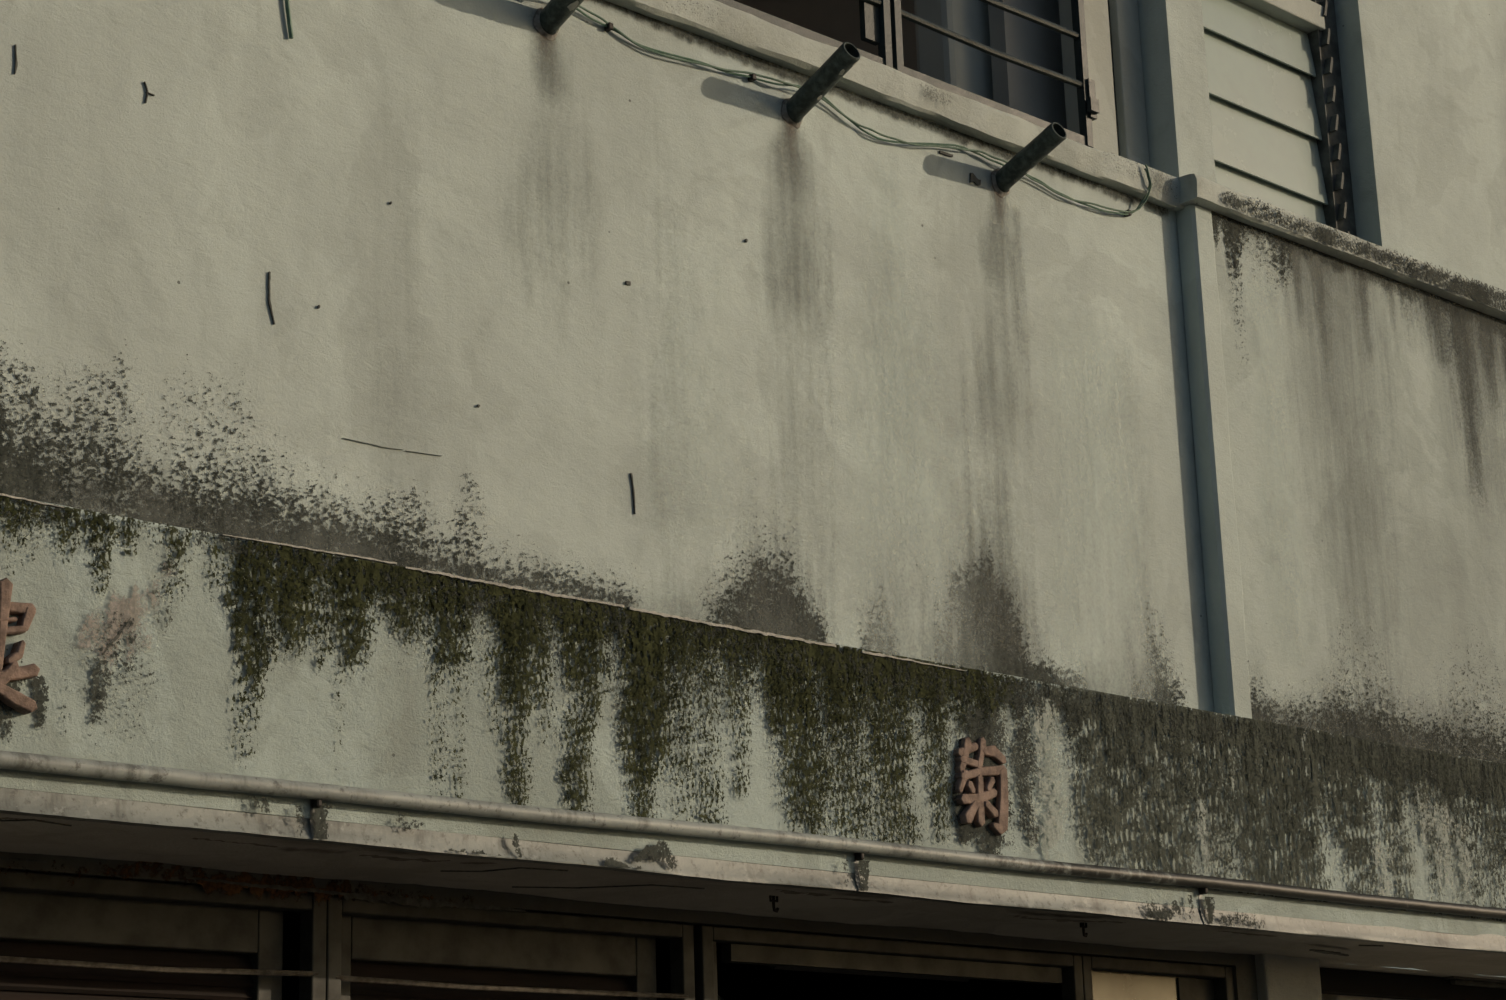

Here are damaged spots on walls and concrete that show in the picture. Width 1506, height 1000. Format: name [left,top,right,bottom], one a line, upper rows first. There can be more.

water stain [1211,191,1506,482]
flaking render [0,493,64,508]
water stain [0,339,1506,928]